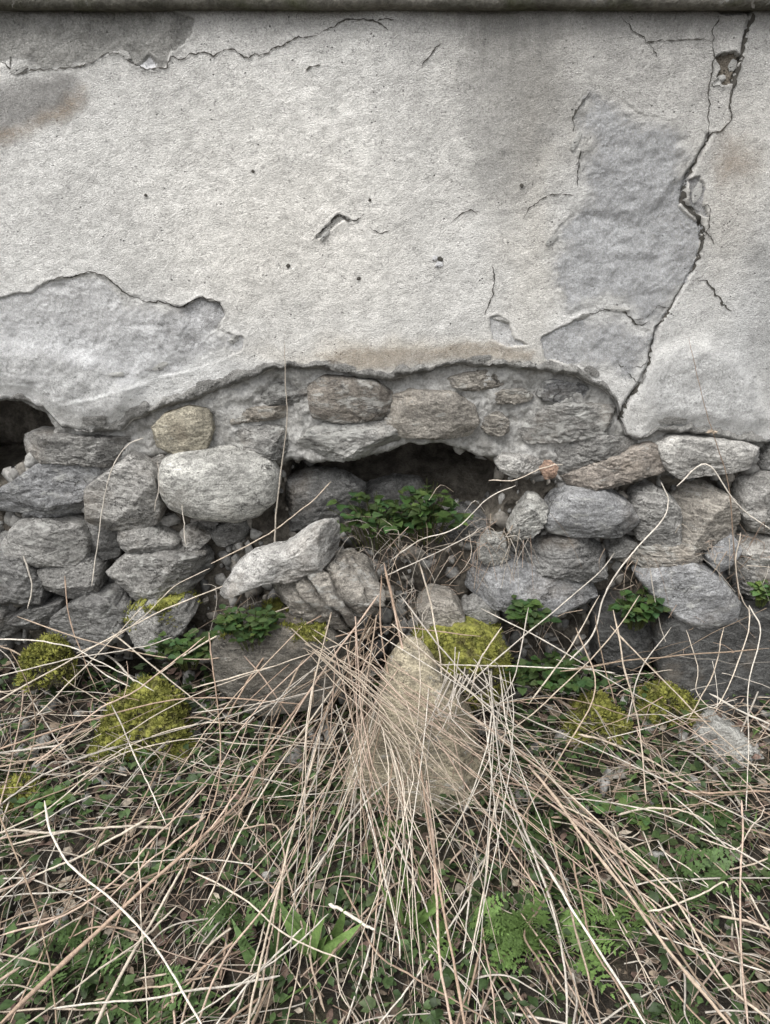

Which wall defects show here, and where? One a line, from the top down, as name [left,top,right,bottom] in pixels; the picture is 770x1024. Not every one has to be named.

spalling [0,11,194,75]
crack [2,18,393,74]
crack [316,214,390,236]
spalling [546,104,708,318]
crack [581,0,755,420]
spalling [0,279,244,398]
spalling [0,313,770,444]